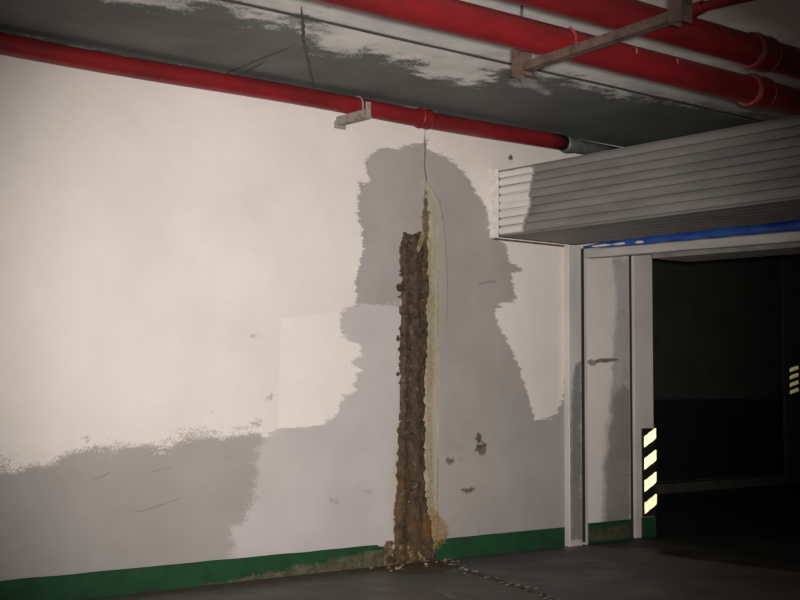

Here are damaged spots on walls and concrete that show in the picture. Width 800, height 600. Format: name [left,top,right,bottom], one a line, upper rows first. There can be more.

crack [424,136,448,330]
water stain [0,137,582,581]
peeling [473,431,487,456]